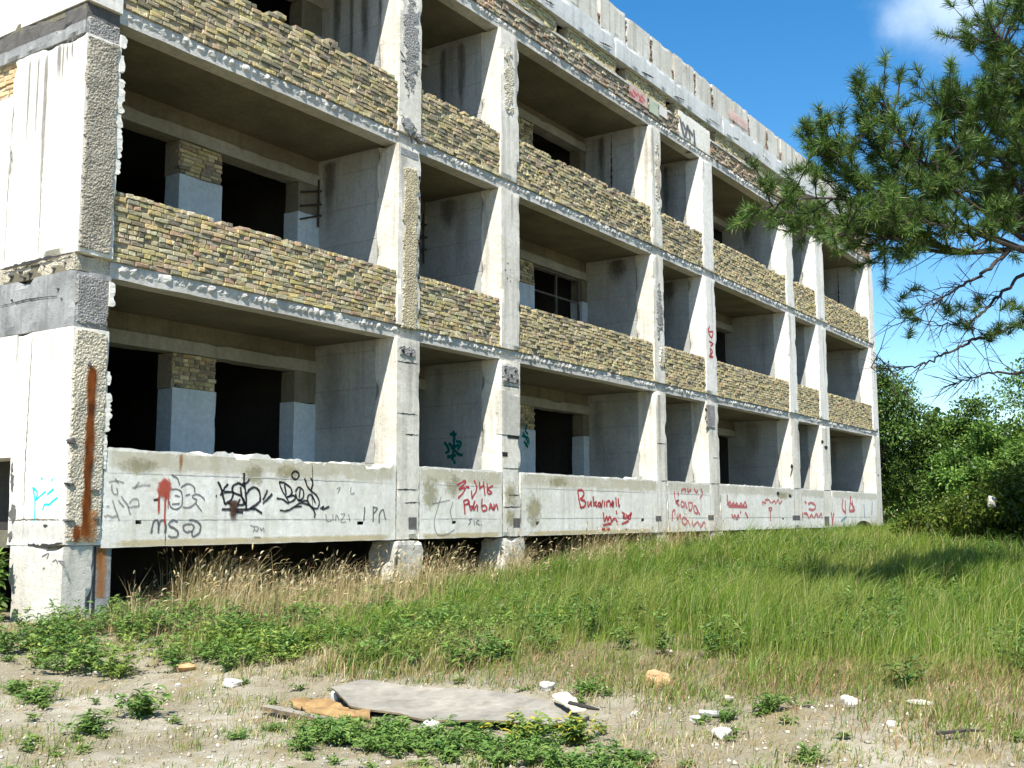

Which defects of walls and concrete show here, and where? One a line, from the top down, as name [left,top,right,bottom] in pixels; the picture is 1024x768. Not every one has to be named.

spalling [8,16,128,279]
spalling [401,0,420,97]
spalling [504,47,515,117]
spalling [401,167,421,331]
rust [73,366,97,542]
spalling [56,273,116,543]
rust [97,548,106,598]